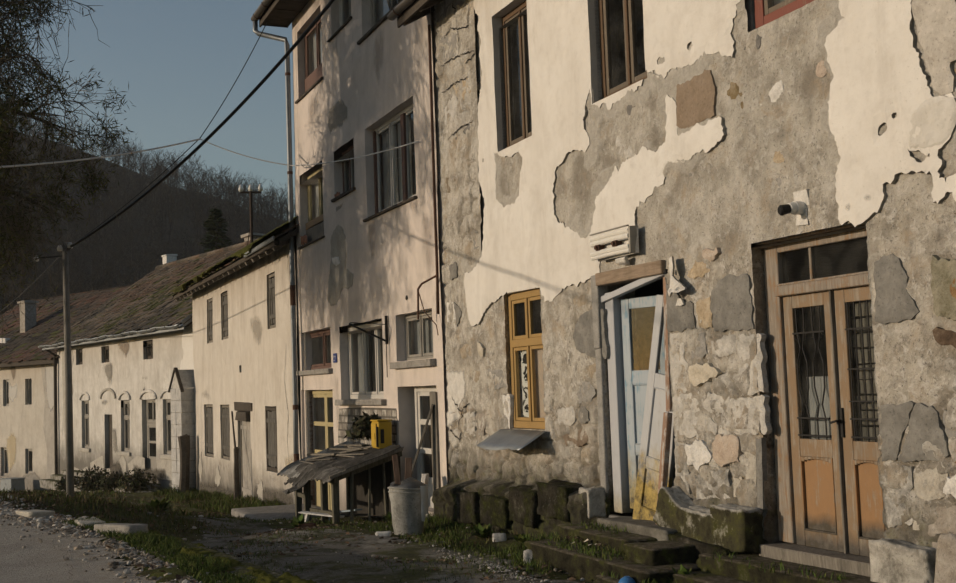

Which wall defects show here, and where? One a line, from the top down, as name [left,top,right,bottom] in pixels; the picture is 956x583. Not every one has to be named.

crack [441,5,475,93]
peeling [911,0,956,97]
spalling [434,0,522,289]
spalling [554,0,844,242]
spalling [898,128,956,178]
spalling [327,225,354,306]
flaking render [445,301,462,328]